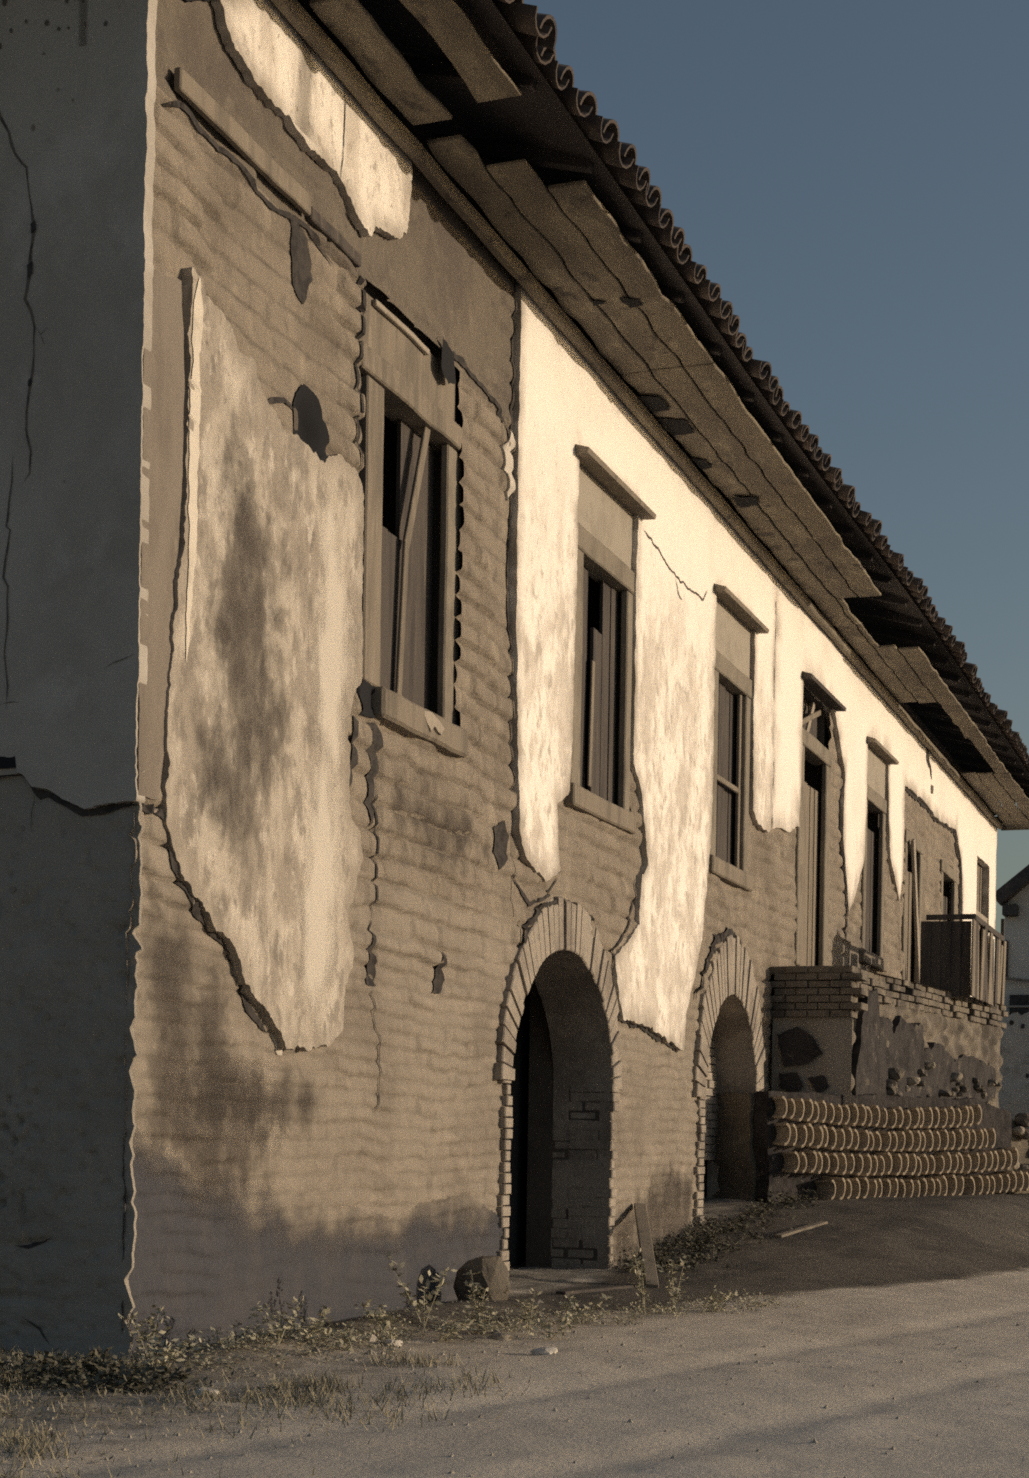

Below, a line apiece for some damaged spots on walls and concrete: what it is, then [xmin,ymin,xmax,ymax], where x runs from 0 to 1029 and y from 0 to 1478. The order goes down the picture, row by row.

spalling [0,756,16,769]
crack [0,113,44,704]
leakage [207,496,279,831]
leakage [304,503,348,1005]
peeling [122,0,643,1259]
crack [645,531,708,601]
spalling [828,710,960,979]
leakage [122,938,503,1360]